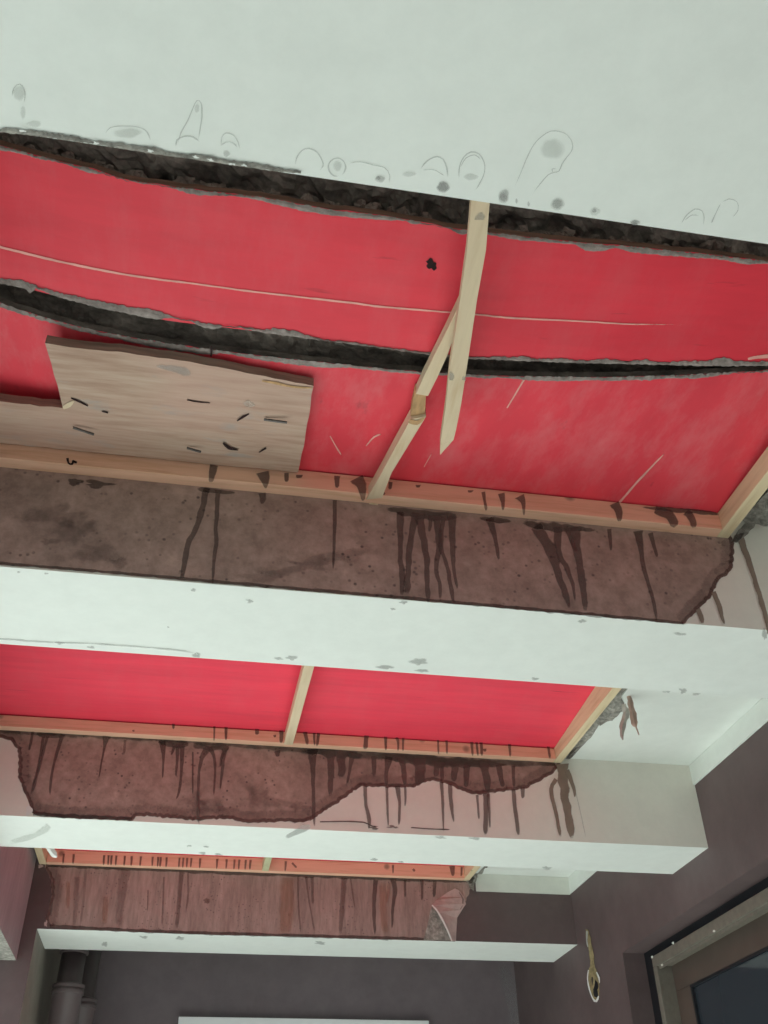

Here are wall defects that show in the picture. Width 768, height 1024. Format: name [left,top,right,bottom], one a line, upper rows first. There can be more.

spalling [0,128,470,224]
spalling [488,203,768,257]
spalling [0,284,430,367]
flaking render [0,467,768,625]
damp [389,507,458,601]
damp [525,521,594,609]
damp [739,538,768,634]
damp [158,739,229,822]
flaking render [0,688,639,823]
damp [304,748,525,834]
damp [549,763,576,837]
flaking render [38,848,488,942]